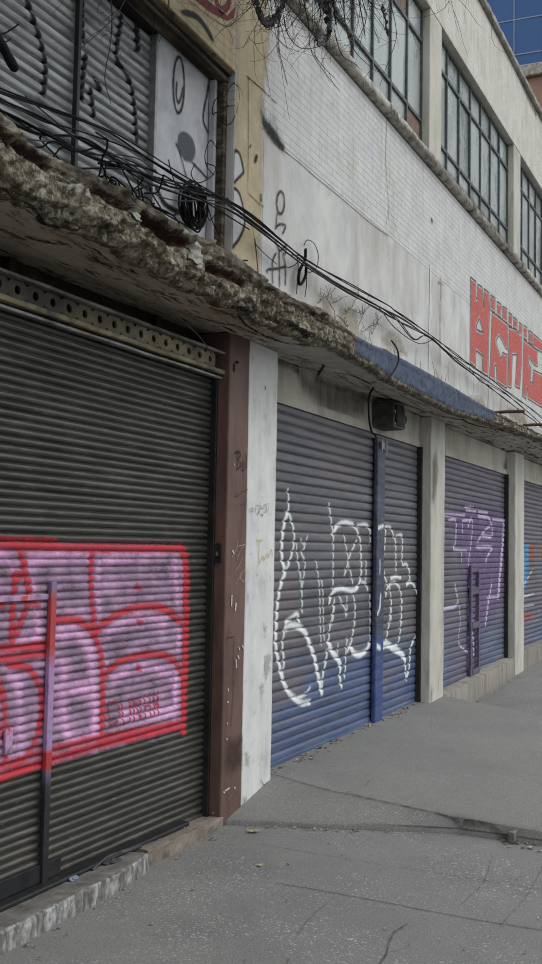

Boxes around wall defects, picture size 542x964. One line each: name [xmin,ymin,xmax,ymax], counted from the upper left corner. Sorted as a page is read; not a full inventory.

spalling [0,131,47,170]
spalling [74,184,243,288]
peeling [323,299,359,336]
leakage [228,741,241,768]